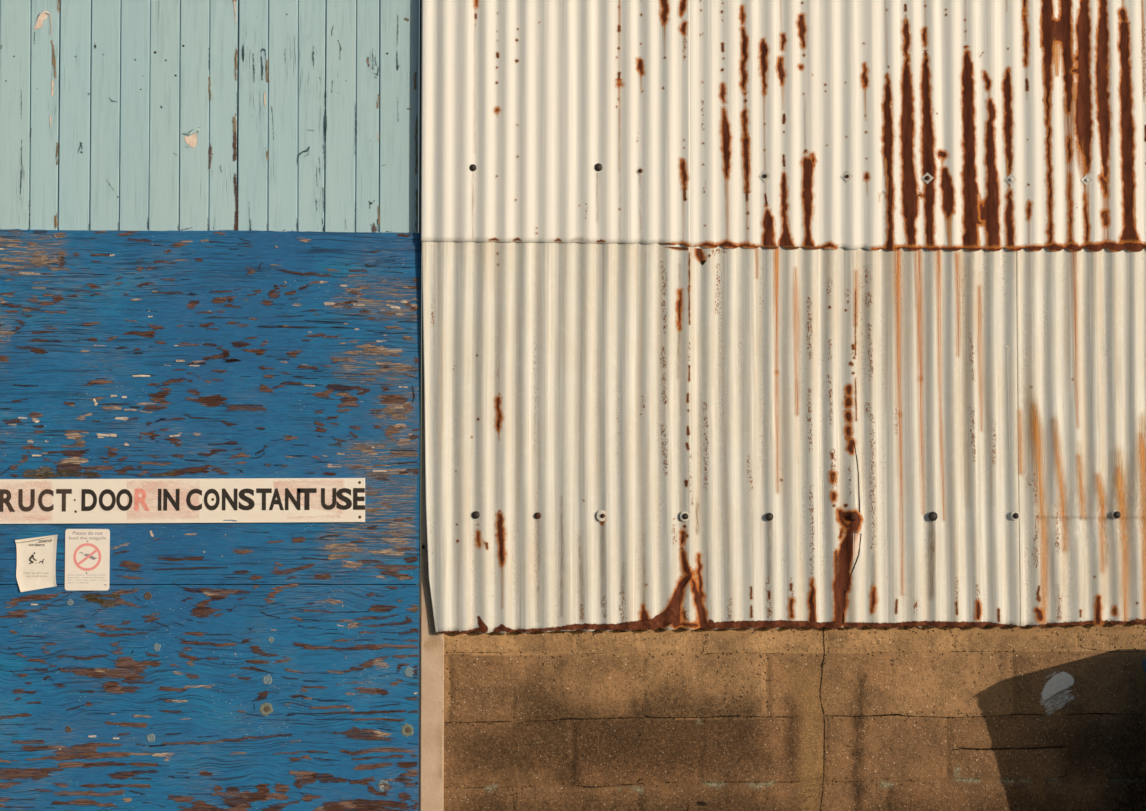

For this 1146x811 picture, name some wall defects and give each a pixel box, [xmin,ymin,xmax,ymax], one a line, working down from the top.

peeling [34,0,60,96]
rust [660,0,837,393]
rust [871,0,1146,486]
peeling [0,49,420,811]
rust [436,268,1146,634]
crack [445,705,785,723]
crack [576,781,675,789]
crack [703,628,1042,811]
crack [952,746,1067,777]